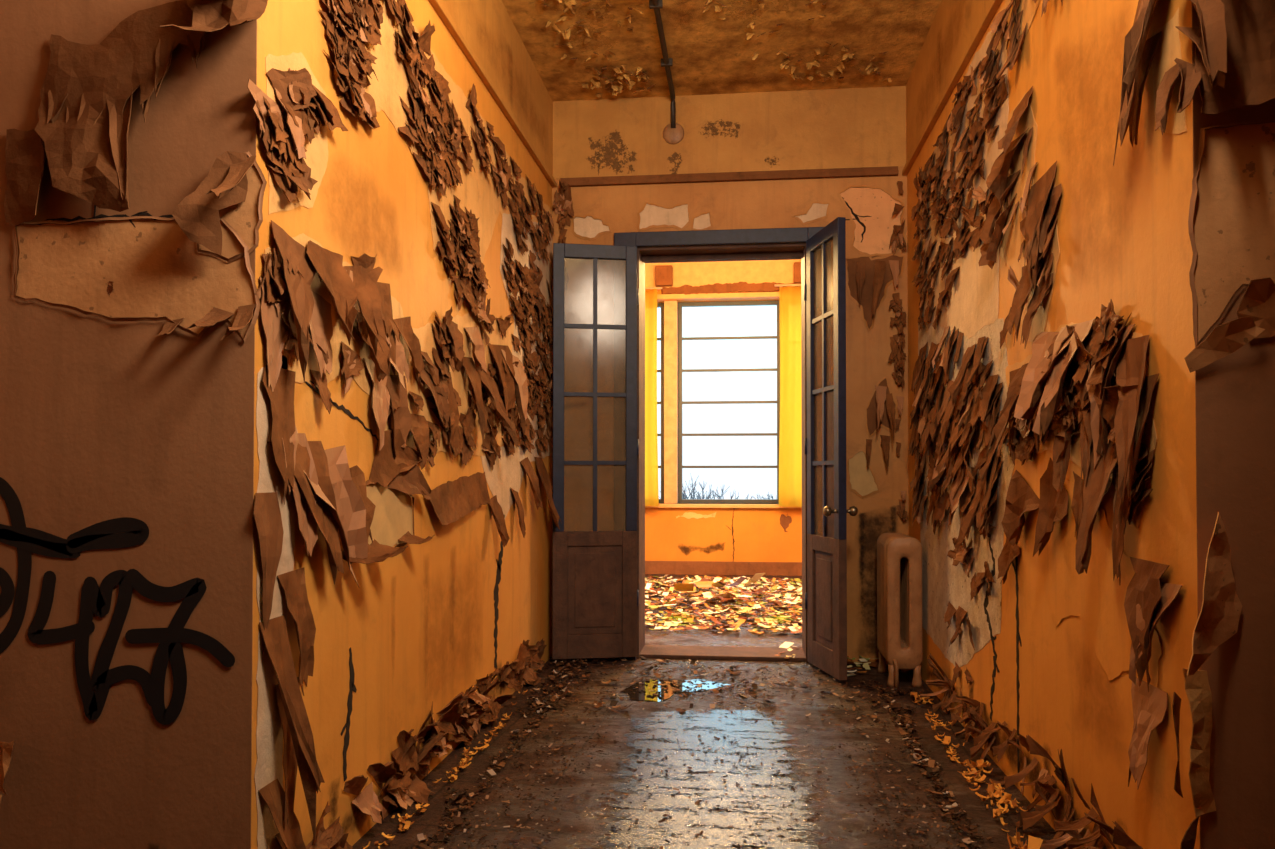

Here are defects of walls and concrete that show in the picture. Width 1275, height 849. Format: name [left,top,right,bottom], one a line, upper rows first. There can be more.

peeling [541,0,656,98]
spalling [587,132,636,174]
spalling [668,152,682,174]
peeling [637,202,713,231]
spalling [700,119,741,137]
peeling [1113,0,1275,373]
peeling [4,0,612,849]
peeling [776,0,1242,849]